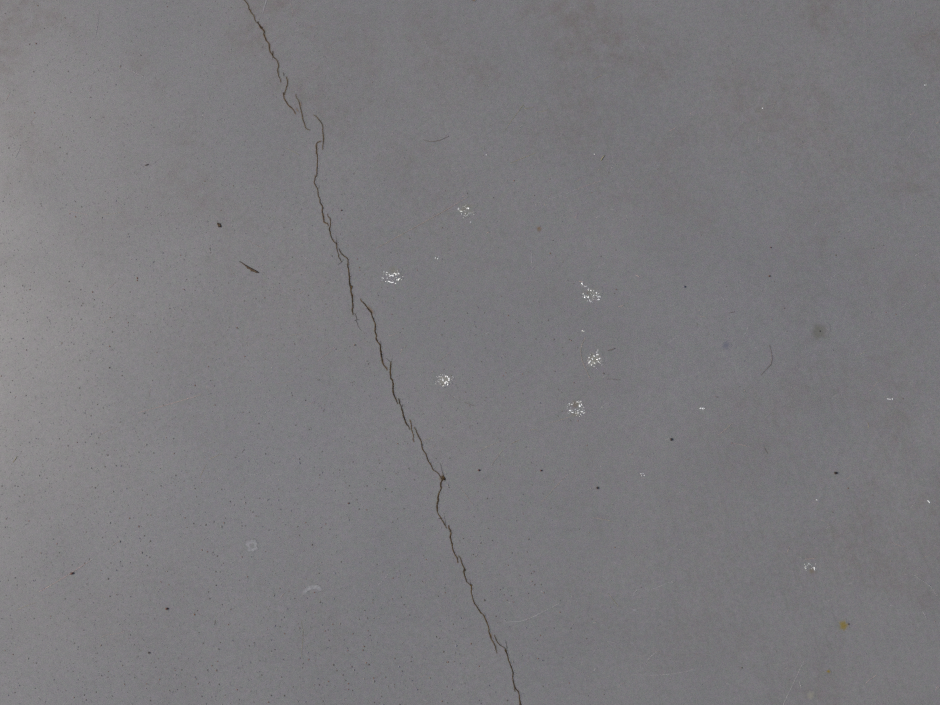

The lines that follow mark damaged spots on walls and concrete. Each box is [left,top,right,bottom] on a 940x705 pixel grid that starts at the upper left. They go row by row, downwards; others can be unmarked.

crack [243,0,522,705]